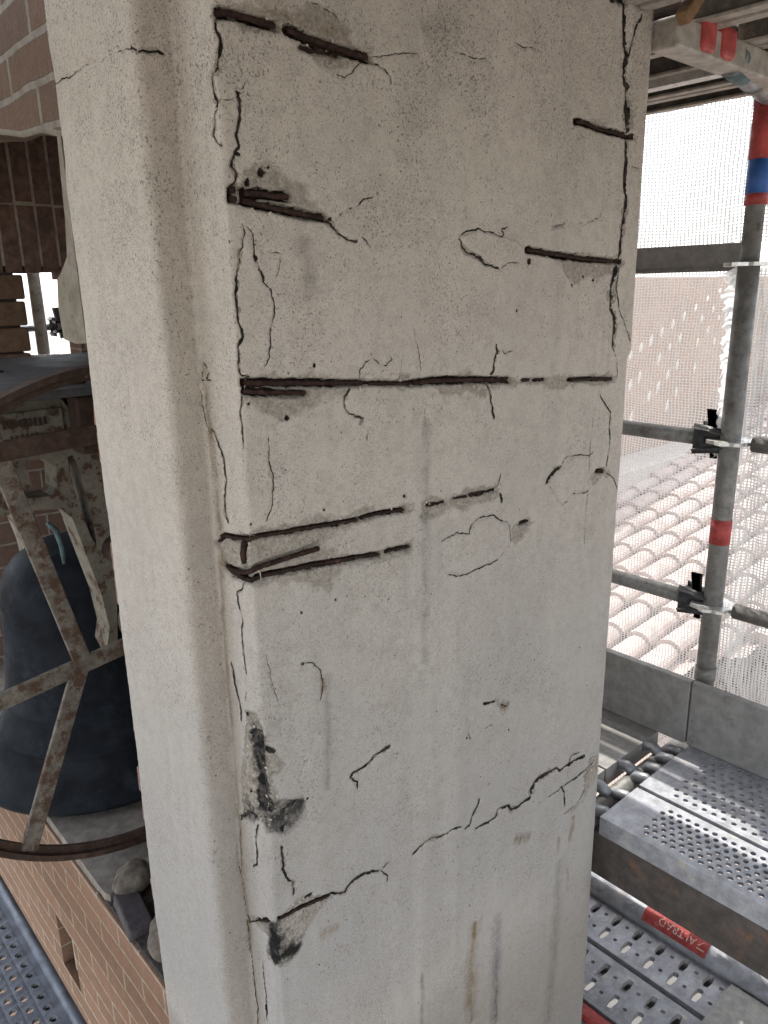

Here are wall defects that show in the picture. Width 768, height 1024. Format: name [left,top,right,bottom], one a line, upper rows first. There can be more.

crack [209,22,255,188]
crack [554,0,654,374]
crack [200,224,281,523]
crack [231,583,282,720]
crack [301,662,323,701]
spalling [241,711,309,833]
crack [350,744,398,790]
crack [330,752,593,895]
crack [239,825,297,1024]
spalling [254,892,330,967]